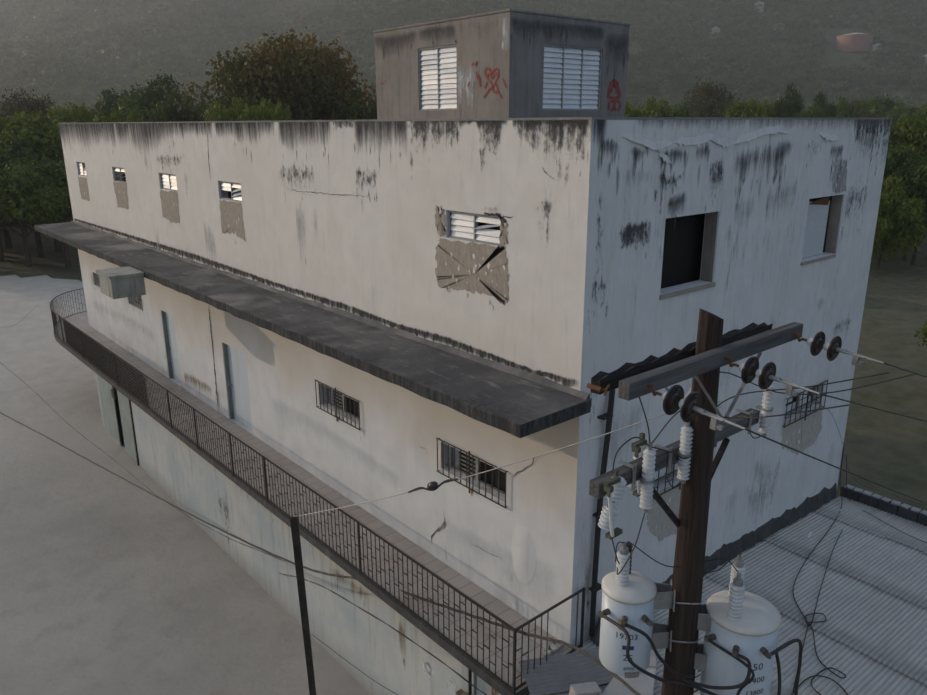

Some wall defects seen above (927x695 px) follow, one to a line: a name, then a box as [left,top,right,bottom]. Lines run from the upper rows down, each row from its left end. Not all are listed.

peeling [78,177,90,201]
peeling [113,182,129,209]
peeling [160,189,180,223]
peeling [220,200,246,244]
damp [57,120,613,170]
peeling [435,205,510,310]
damp [621,221,650,256]
damp [655,151,686,220]
damp [737,144,788,191]
damp [809,119,893,162]
peeling [781,406,822,455]
peeling [647,485,682,542]